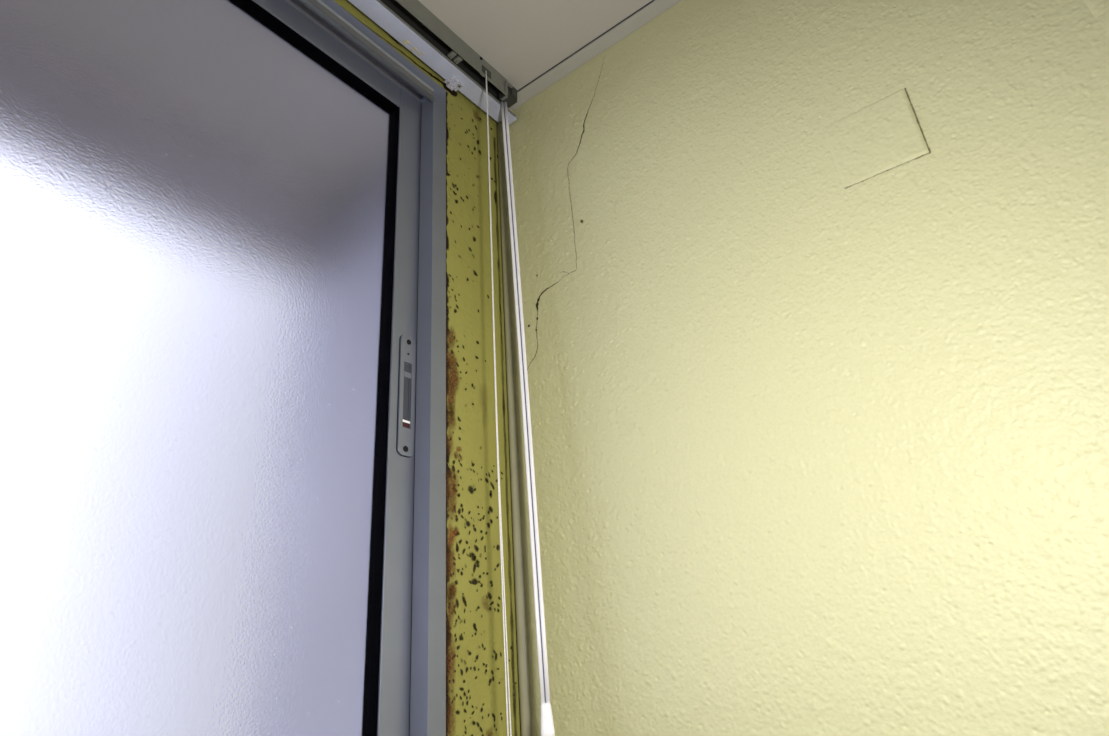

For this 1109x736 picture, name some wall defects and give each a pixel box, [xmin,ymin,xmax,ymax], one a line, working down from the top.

leakage [460,118,499,241]
crack [528,86,597,358]
leakage [448,391,517,736]